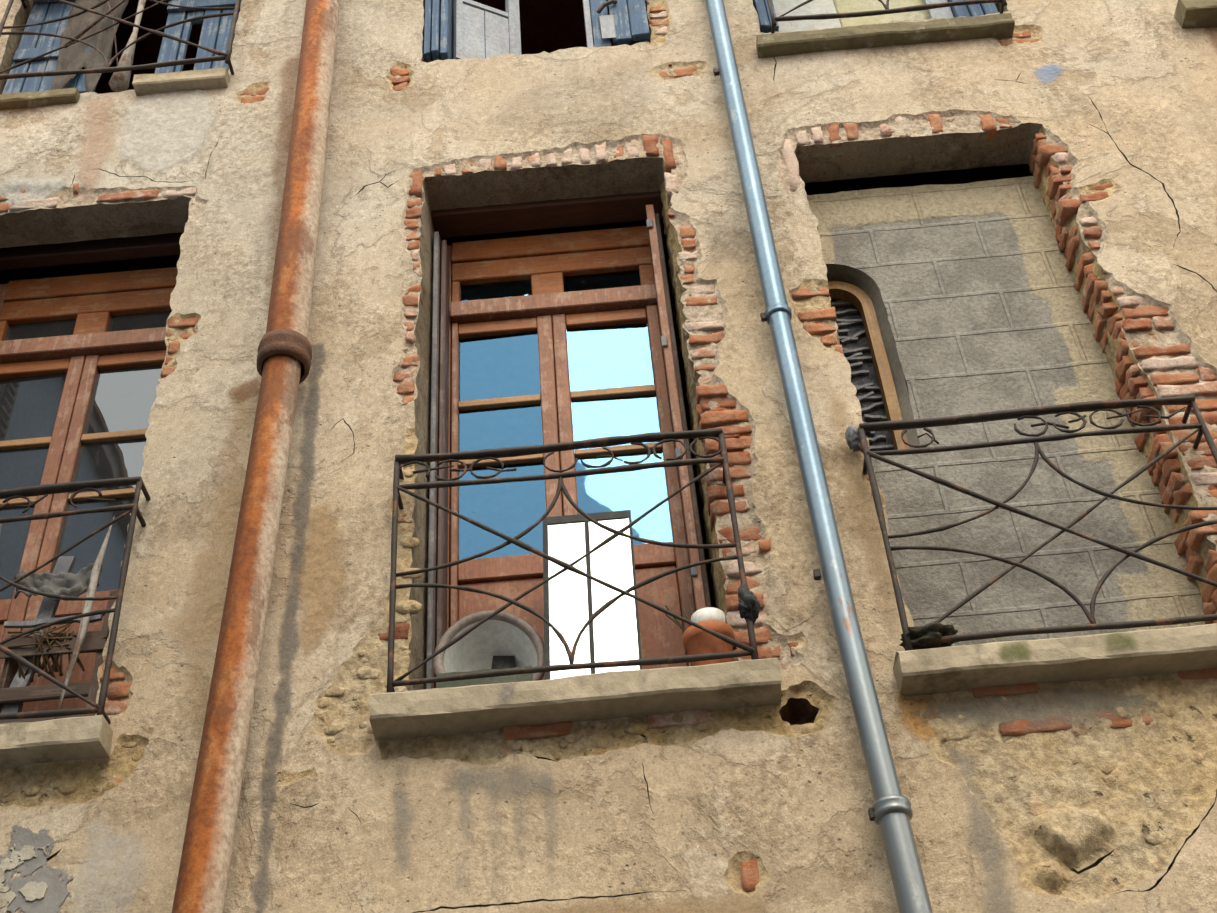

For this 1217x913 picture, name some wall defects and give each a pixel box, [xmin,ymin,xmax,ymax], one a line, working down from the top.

flaking render [0,183,208,222]
flaking render [775,109,1022,200]
crack [1088,96,1217,292]
flaking render [788,279,843,354]
flaking render [389,134,808,671]
flaking render [1028,127,1217,625]
flaking render [310,426,840,767]
flaking render [0,733,149,810]
peeling [0,825,73,913]
crack [413,890,686,913]
crack [1071,850,1114,874]
crack [1116,790,1217,894]